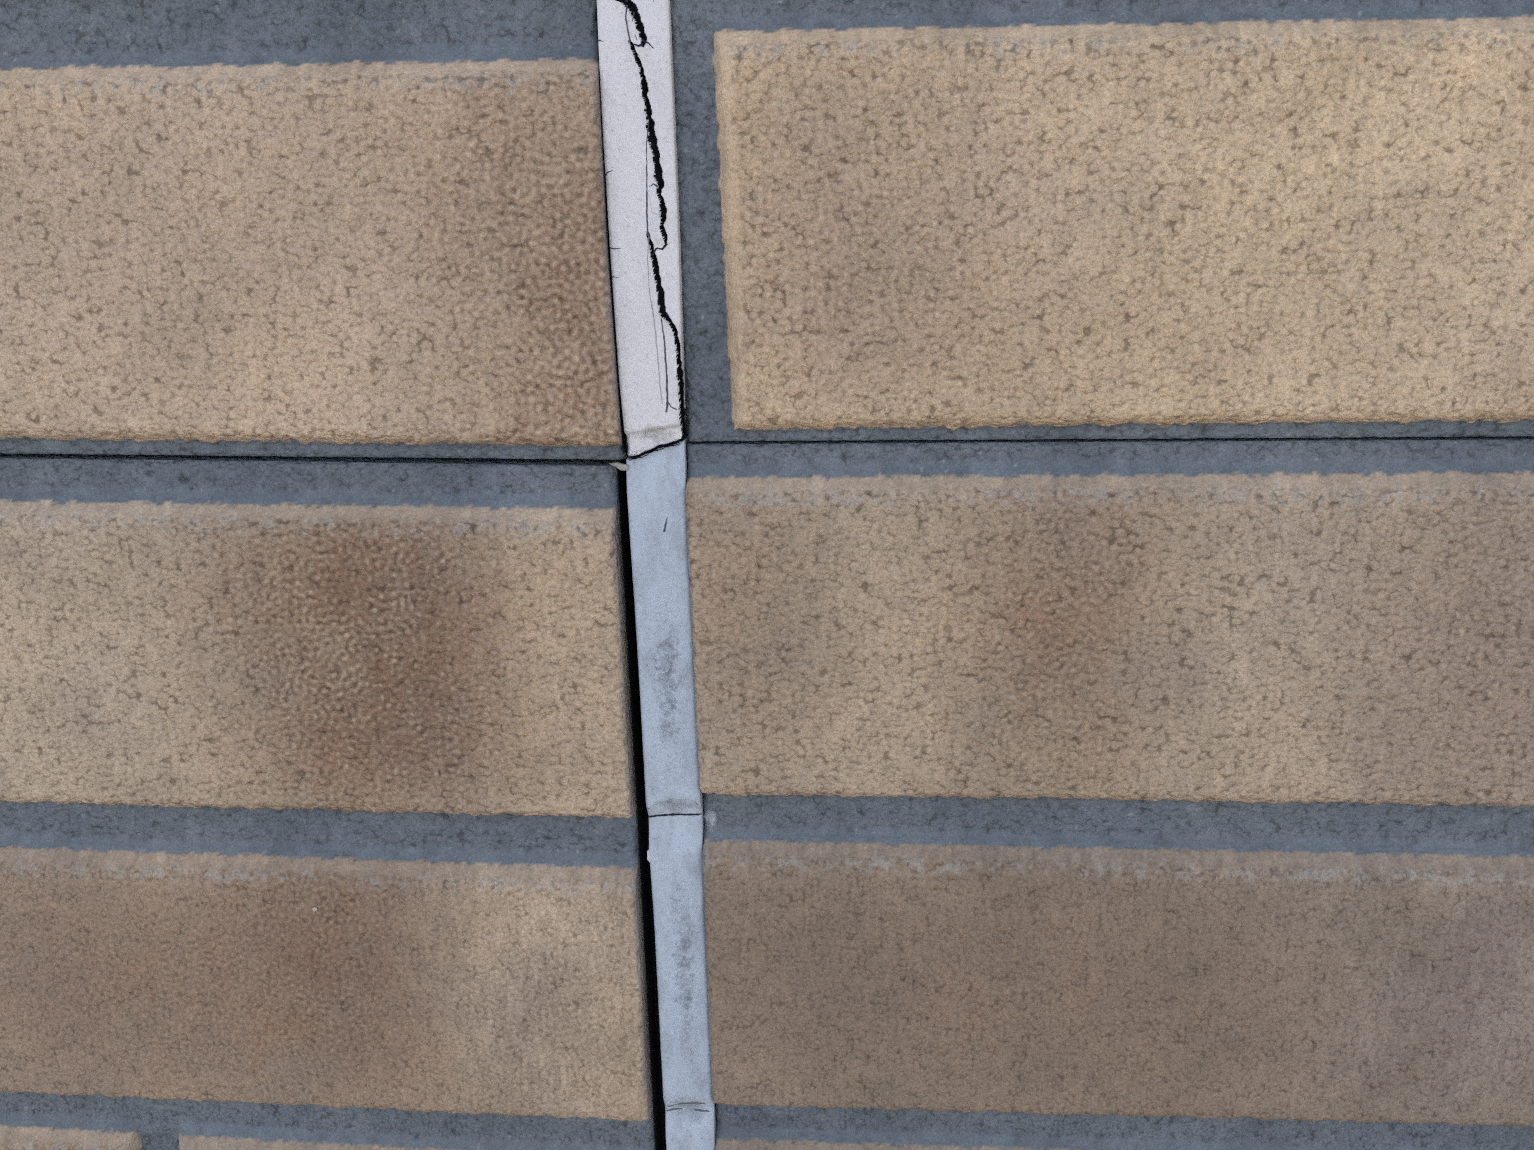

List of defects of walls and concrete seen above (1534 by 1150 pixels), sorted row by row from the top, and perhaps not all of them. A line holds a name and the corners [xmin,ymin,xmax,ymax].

crack [596,0,687,454]